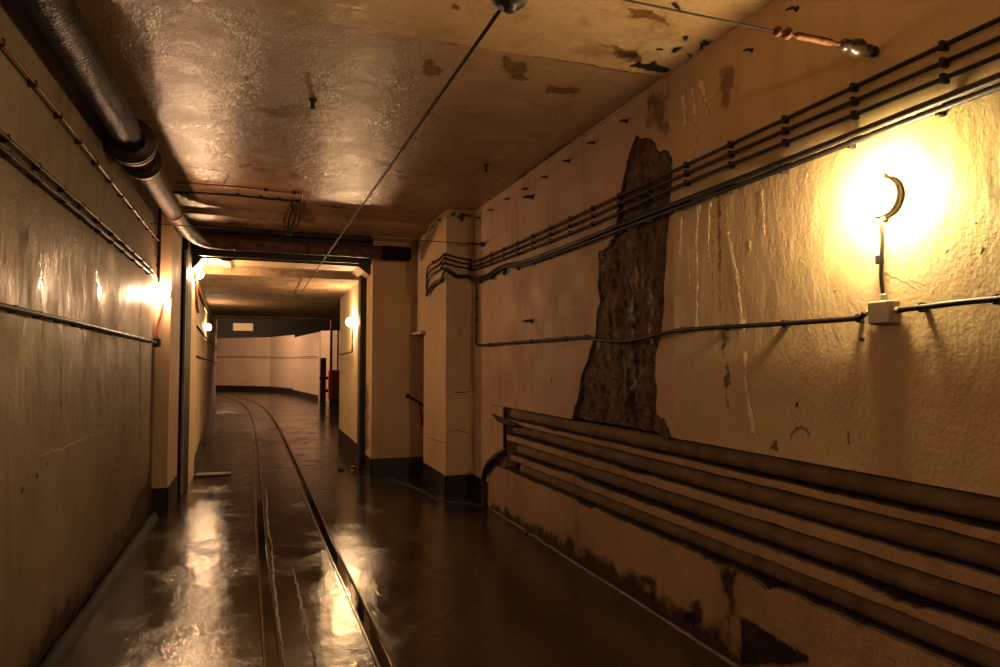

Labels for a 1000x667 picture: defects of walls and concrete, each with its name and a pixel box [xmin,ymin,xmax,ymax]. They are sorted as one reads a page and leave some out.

leakage [503,56,527,81]
peeling [628,39,689,63]
leakage [721,69,733,104]
spalling [577,138,673,440]
leakage [491,505,808,667]